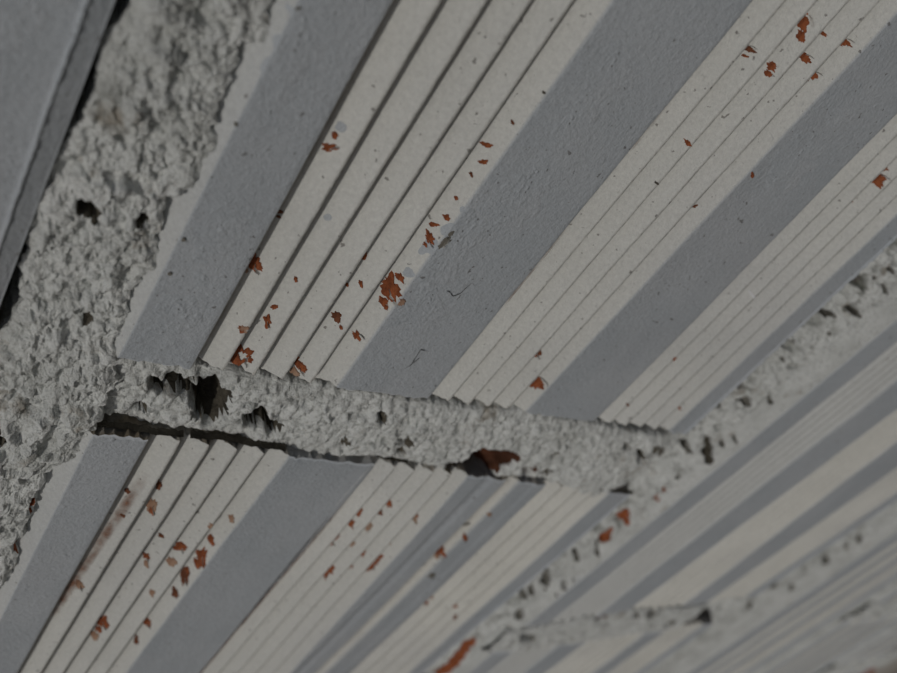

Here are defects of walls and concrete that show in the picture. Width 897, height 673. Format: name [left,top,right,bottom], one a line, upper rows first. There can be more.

crack [98,420,286,451]
crack [377,455,407,463]
crack [601,487,633,495]